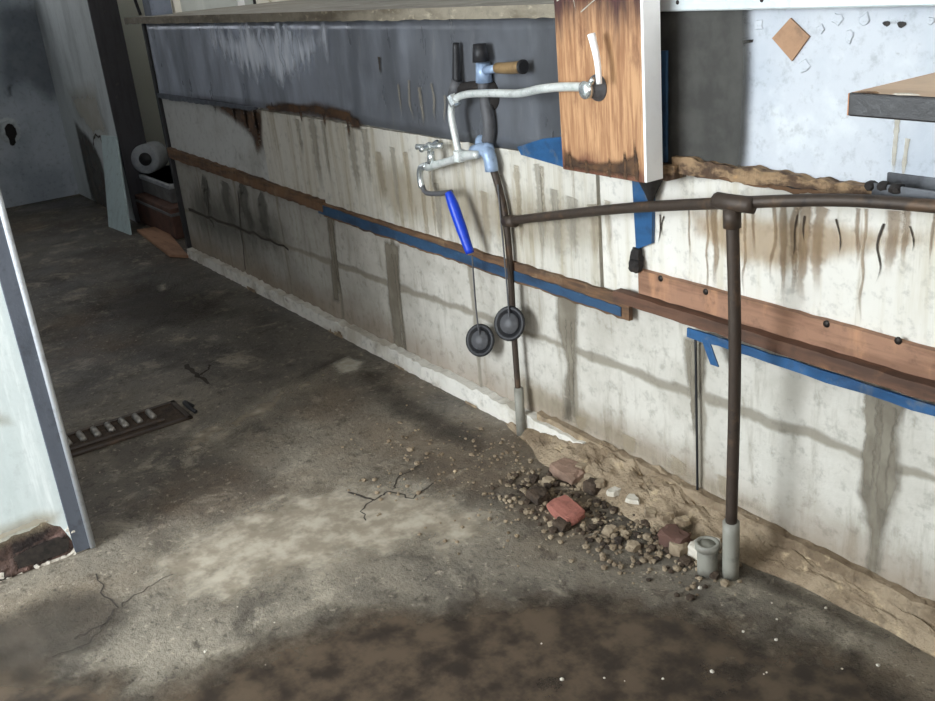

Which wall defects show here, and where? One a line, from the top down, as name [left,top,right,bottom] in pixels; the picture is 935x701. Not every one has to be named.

rust [214,103,361,150]
leakage [862,394,896,515]
flaking render [0,527,87,582]